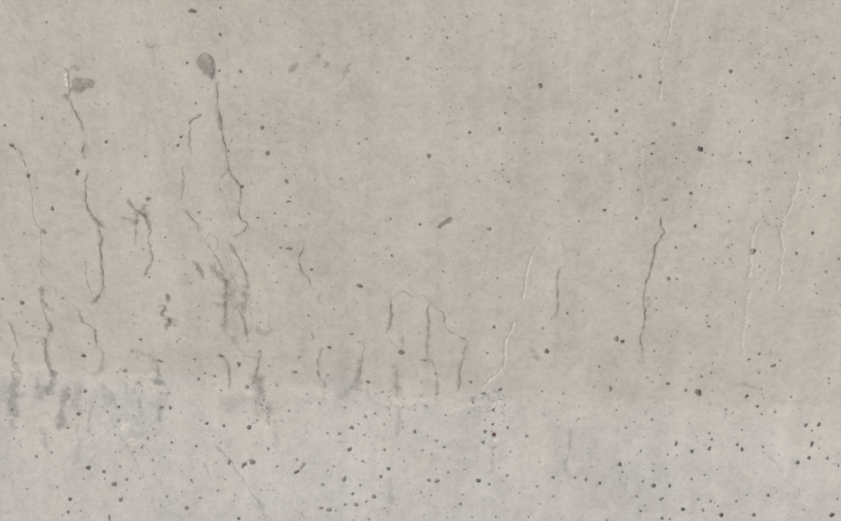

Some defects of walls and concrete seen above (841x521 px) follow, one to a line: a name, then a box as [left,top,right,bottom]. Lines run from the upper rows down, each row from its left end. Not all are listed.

crack [43,52,105,375]
crack [128,200,153,275]
crack [182,86,270,338]
crack [378,285,468,398]
crack [640,216,665,350]